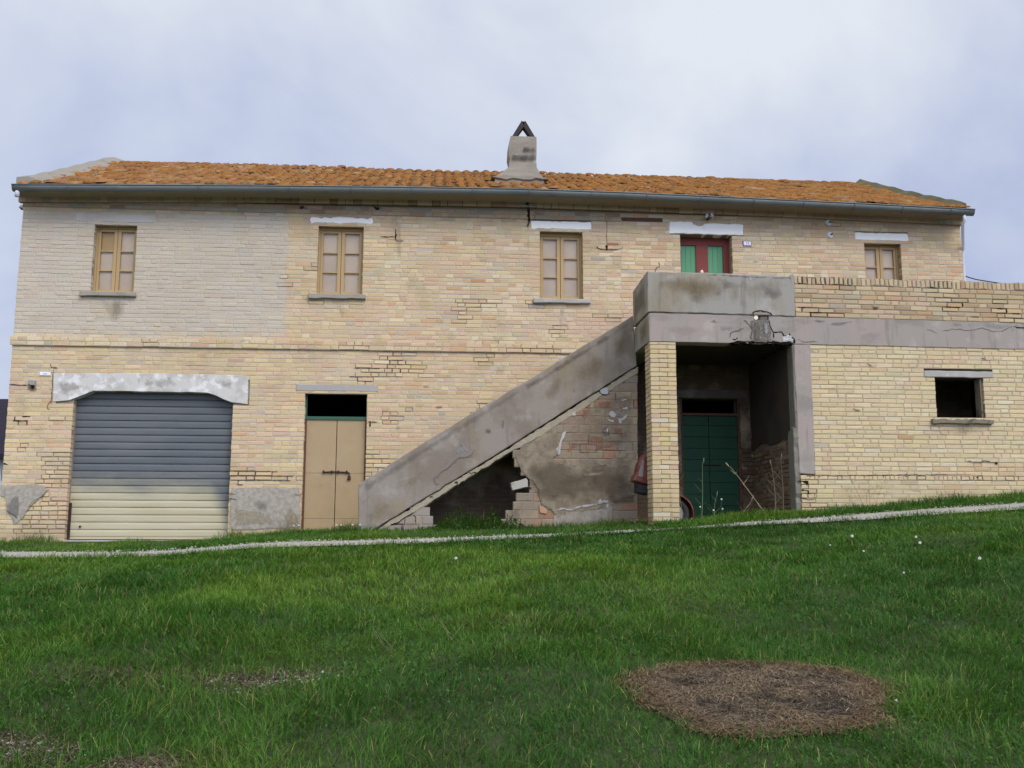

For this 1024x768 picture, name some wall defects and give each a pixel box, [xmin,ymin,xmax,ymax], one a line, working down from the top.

spalling [727,310,795,346]
crack [927,324,1024,332]
peeling [599,388,628,424]
flaking render [515,428,636,527]